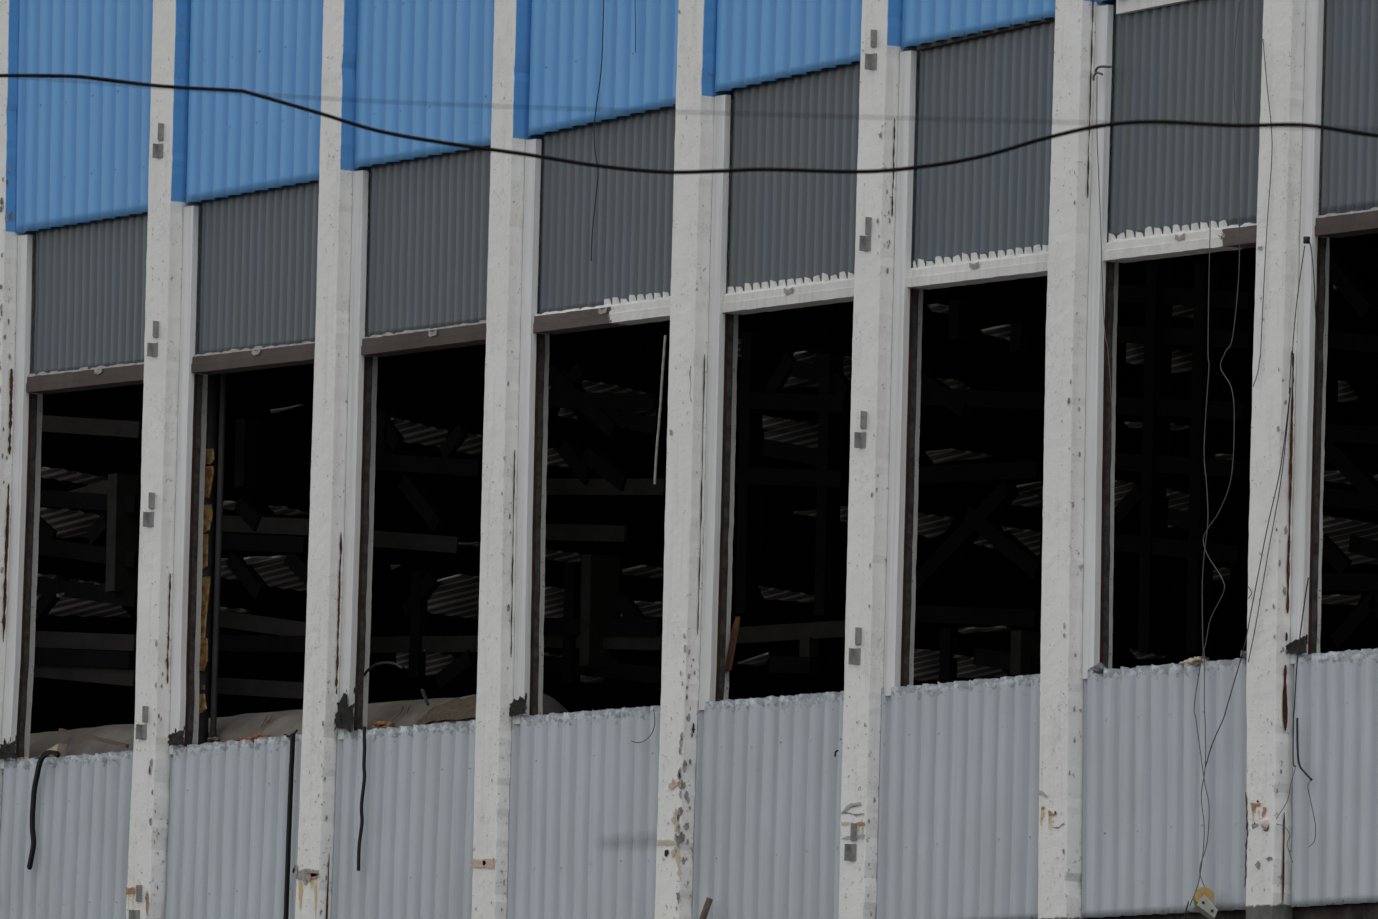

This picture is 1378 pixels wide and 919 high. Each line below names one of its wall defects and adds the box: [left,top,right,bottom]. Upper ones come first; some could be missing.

rust [299,862,329,919]
spalling [668,634,696,911]